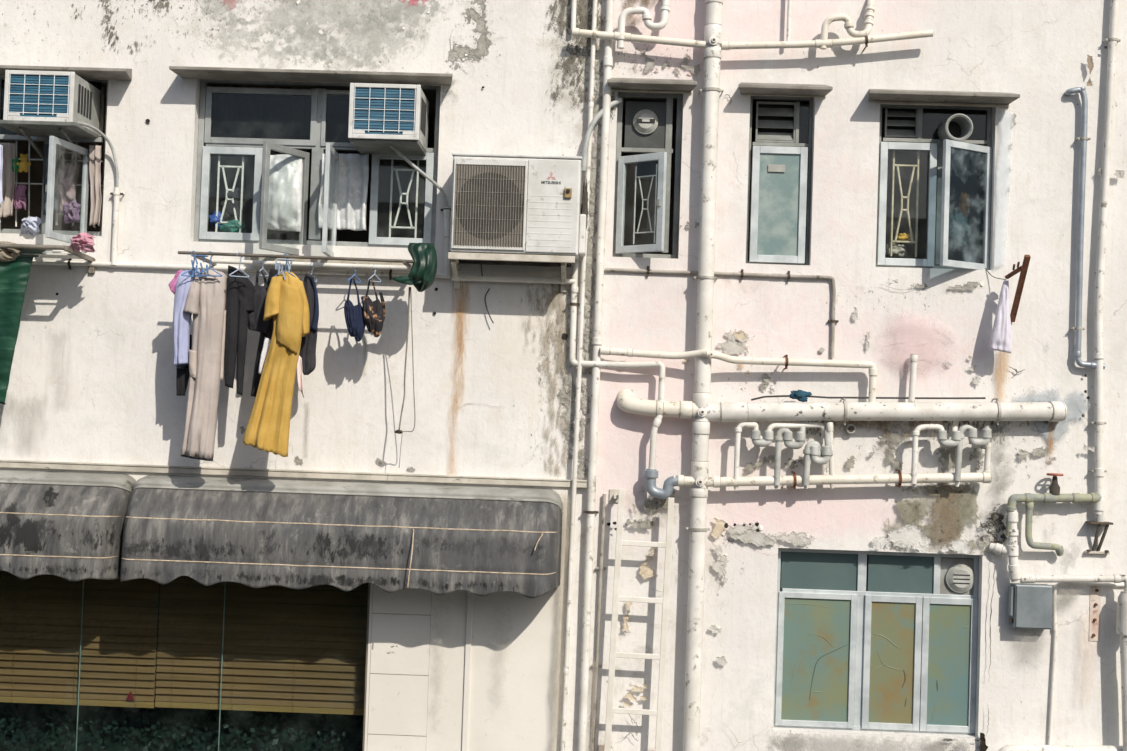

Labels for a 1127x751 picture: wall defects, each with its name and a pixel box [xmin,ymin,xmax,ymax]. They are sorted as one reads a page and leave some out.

peeling [445,0,494,72]
leakage [545,0,617,120]
leakage [526,285,571,472]
spalling [613,519,653,530]
peeling [639,547,661,592]
spalling [711,518,815,590]